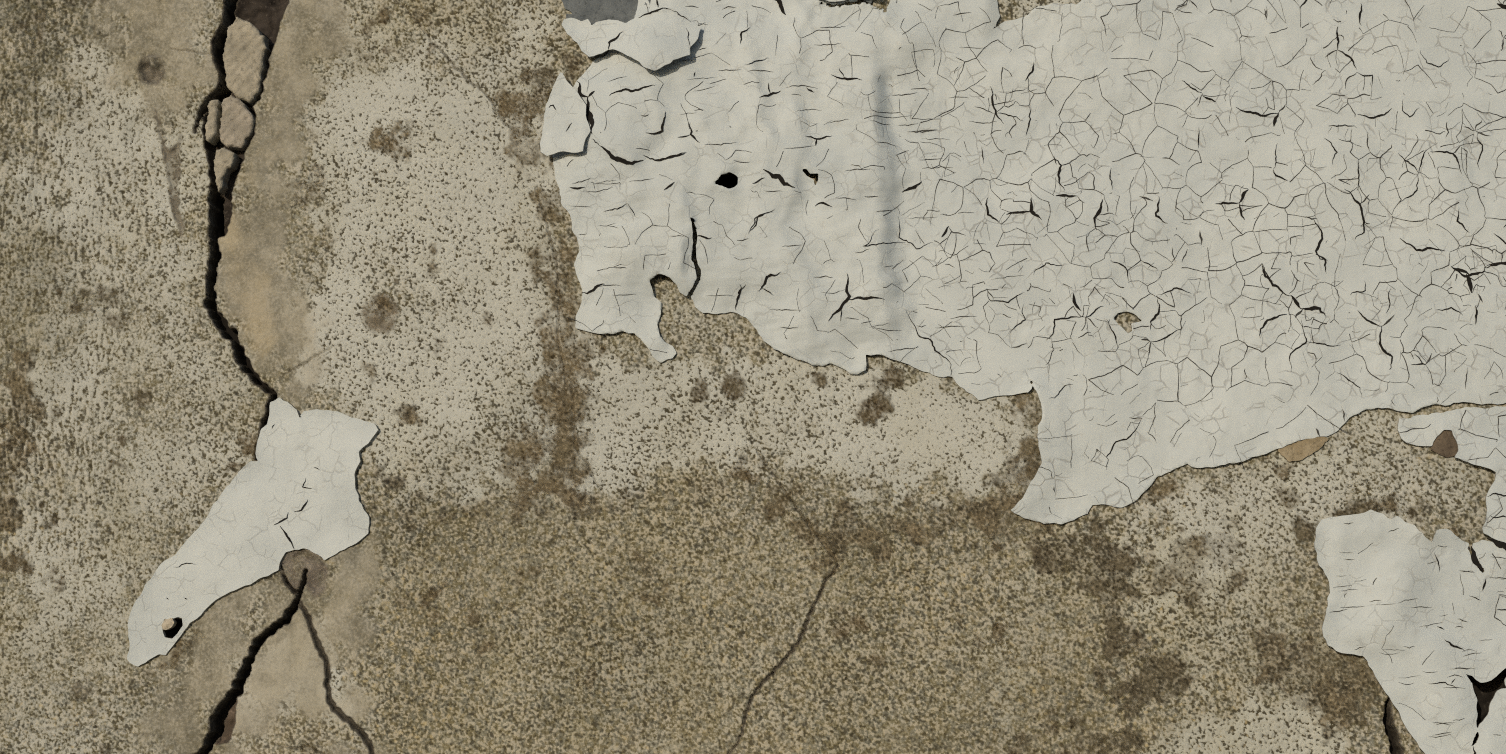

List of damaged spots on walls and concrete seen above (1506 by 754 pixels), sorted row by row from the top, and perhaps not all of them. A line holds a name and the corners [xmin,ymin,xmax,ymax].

spalling [715,174,738,188]
crack [203,189,277,461]
peeling [864,0,1506,754]
peeling [127,398,379,666]
crack [194,565,374,754]
crack [727,565,839,754]